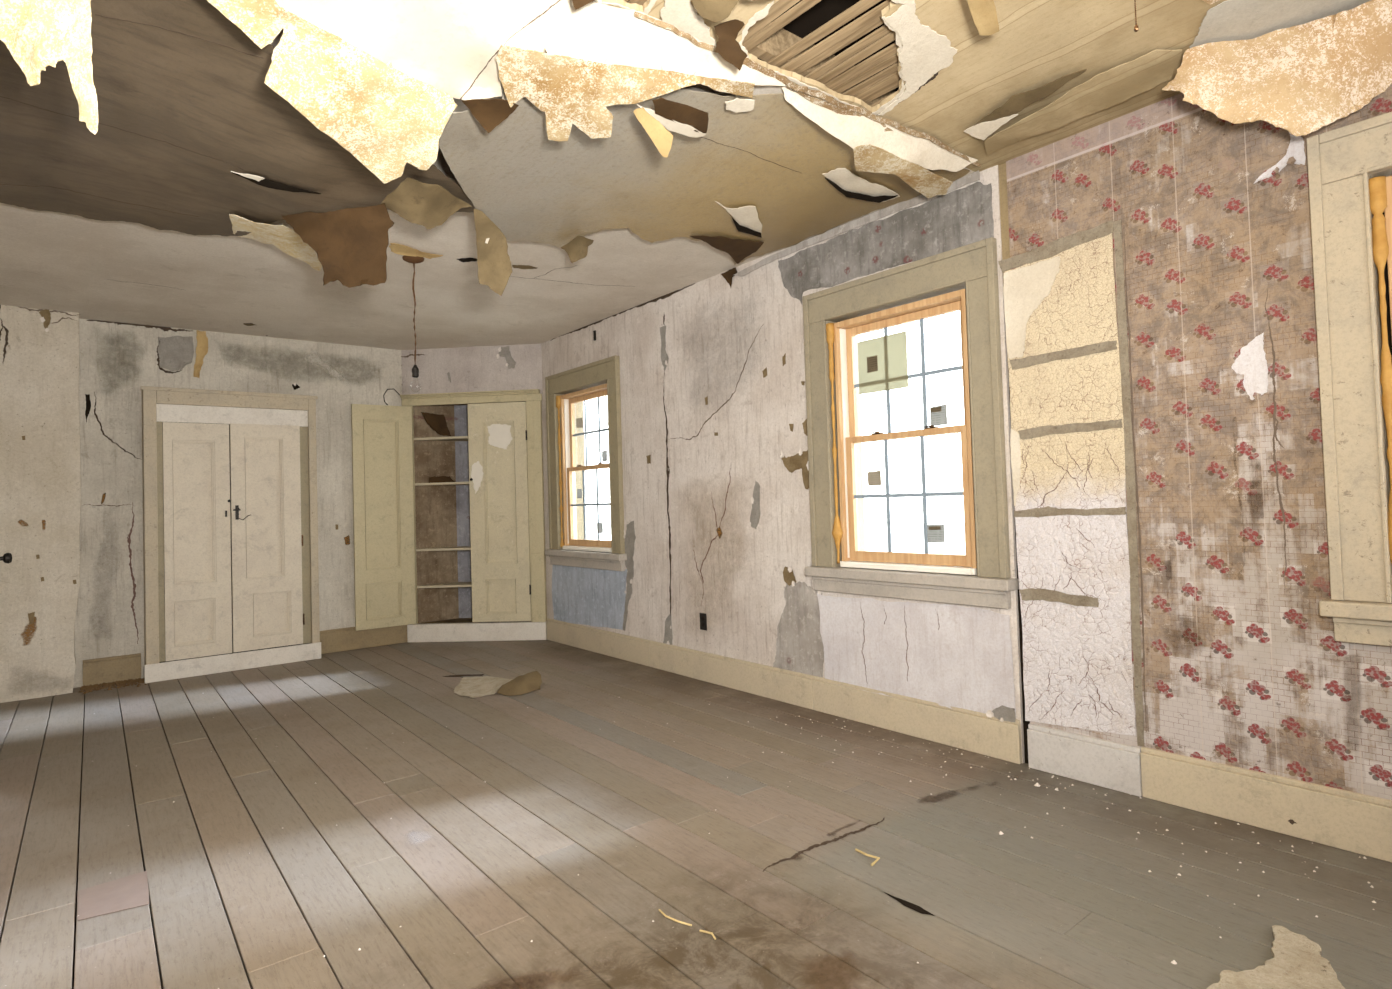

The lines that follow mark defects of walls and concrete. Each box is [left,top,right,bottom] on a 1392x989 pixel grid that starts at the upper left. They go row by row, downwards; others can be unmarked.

flaking render [593,0,716,44]
flaking render [739,0,957,116]
flaking render [1189,0,1371,48]
flaking render [156,335,194,374]
crack [94,392,142,460]
crack [663,324,764,614]
peeling [780,419,809,489]
crack [998,220,1147,747]
crack [84,502,139,644]
peeling [623,521,636,631]
peeling [783,567,796,587]
flaking render [817,590,1016,722]